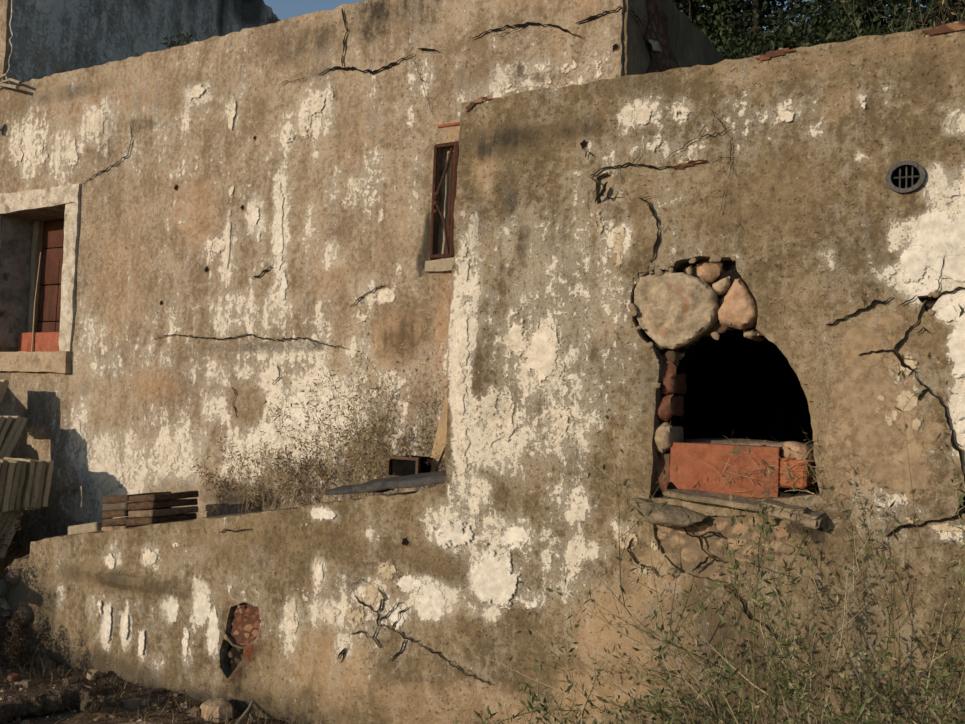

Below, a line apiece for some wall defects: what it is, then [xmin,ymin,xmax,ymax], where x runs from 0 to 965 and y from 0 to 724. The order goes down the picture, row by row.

crack [277,8,439,114]
crack [473,6,643,38]
crack [585,105,739,262]
peeling [882,186,965,283]
crack [151,327,348,358]
spalling [628,255,767,497]
spalling [827,310,945,502]
crack [826,253,965,482]
peeling [918,290,965,378]
peeling [469,524,540,609]
peeling [167,591,264,681]
crack [337,579,492,685]